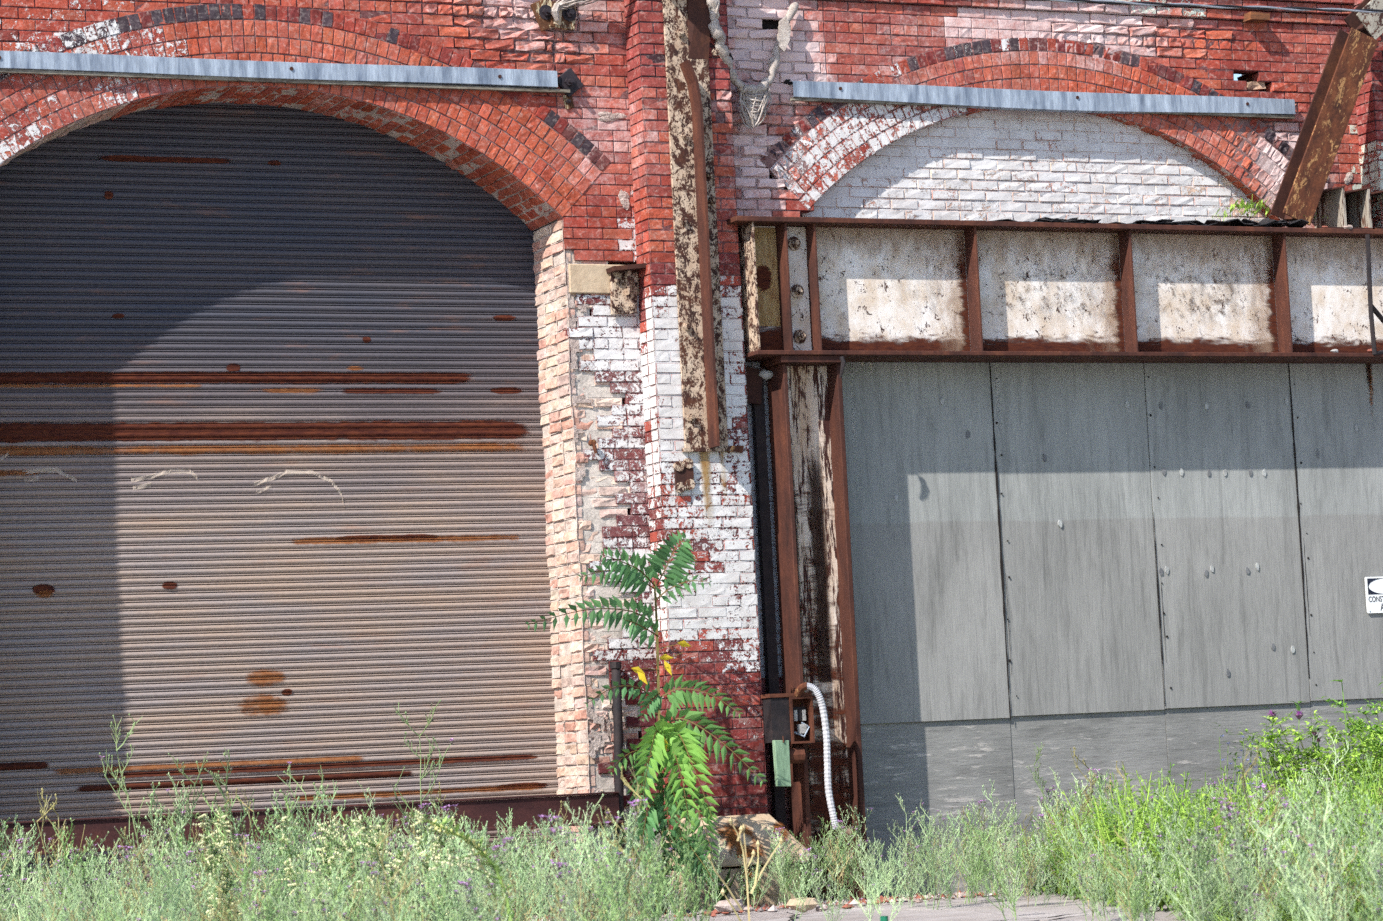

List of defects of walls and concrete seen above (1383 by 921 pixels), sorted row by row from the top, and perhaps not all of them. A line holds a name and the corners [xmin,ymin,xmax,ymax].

peeling [0,0,188,57]
peeling [0,73,147,164]
peeling [617,190,644,262]
corrosion [816,227,1383,404]
corrosion [0,364,470,394]
corrosion [0,420,529,476]
peeling [567,276,783,738]
corrosion [295,534,516,544]
corrosion [239,670,292,715]
corrosion [792,458,855,898]
corrosion [0,754,547,801]